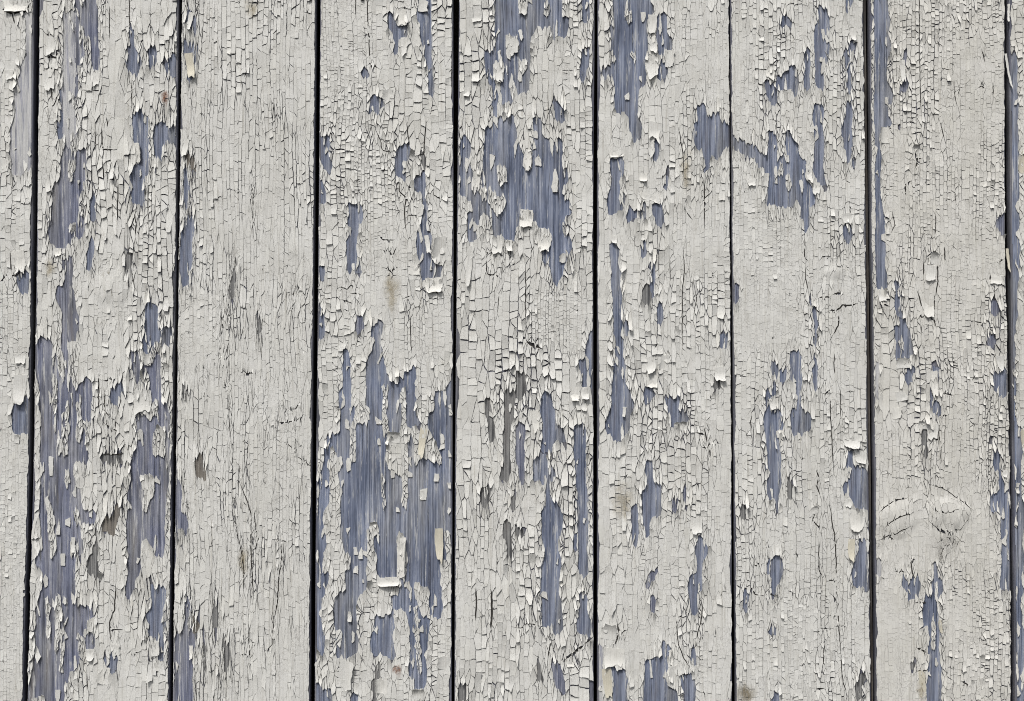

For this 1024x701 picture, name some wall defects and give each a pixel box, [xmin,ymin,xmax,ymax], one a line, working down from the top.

peeling [0,0,233,701]
crack [234,484,282,655]
peeling [316,296,469,701]
crack [486,252,540,348]
crack [475,591,625,659]
peeling [459,0,689,455]
peeling [476,331,712,701]
peeling [691,0,858,234]
crack [804,239,855,690]
crack [881,485,970,554]
crack [917,198,956,329]
peeling [985,53,1024,701]